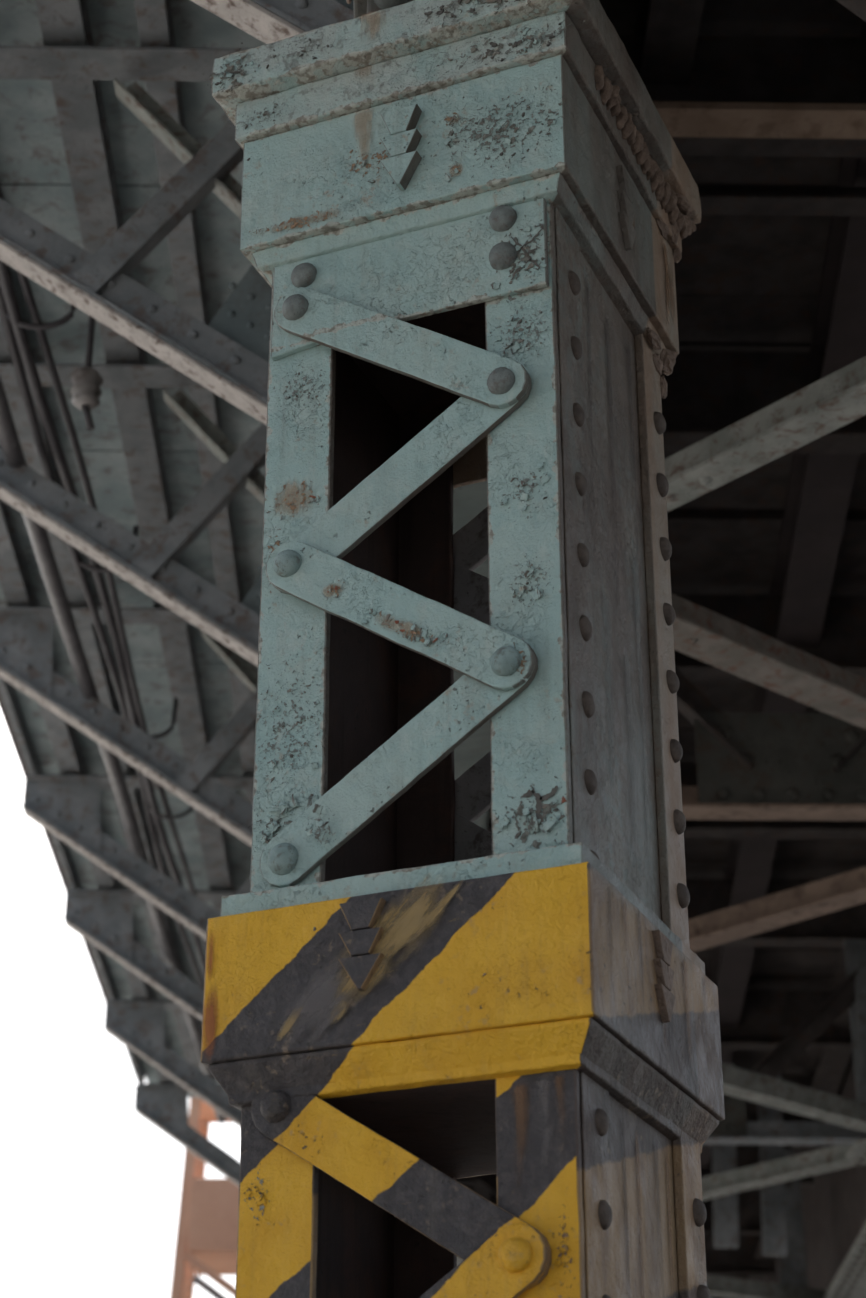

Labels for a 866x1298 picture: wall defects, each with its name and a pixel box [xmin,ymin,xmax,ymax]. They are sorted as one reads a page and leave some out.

peeling [407,0,531,29]
peeling [209,27,348,93]
peeling [436,20,585,75]
peeling [421,86,566,178]
peeling [335,142,389,205]
peeling [498,462,556,519]
peeling [510,555,560,612]
peeling [494,776,572,851]
peeling [279,883,460,1037]